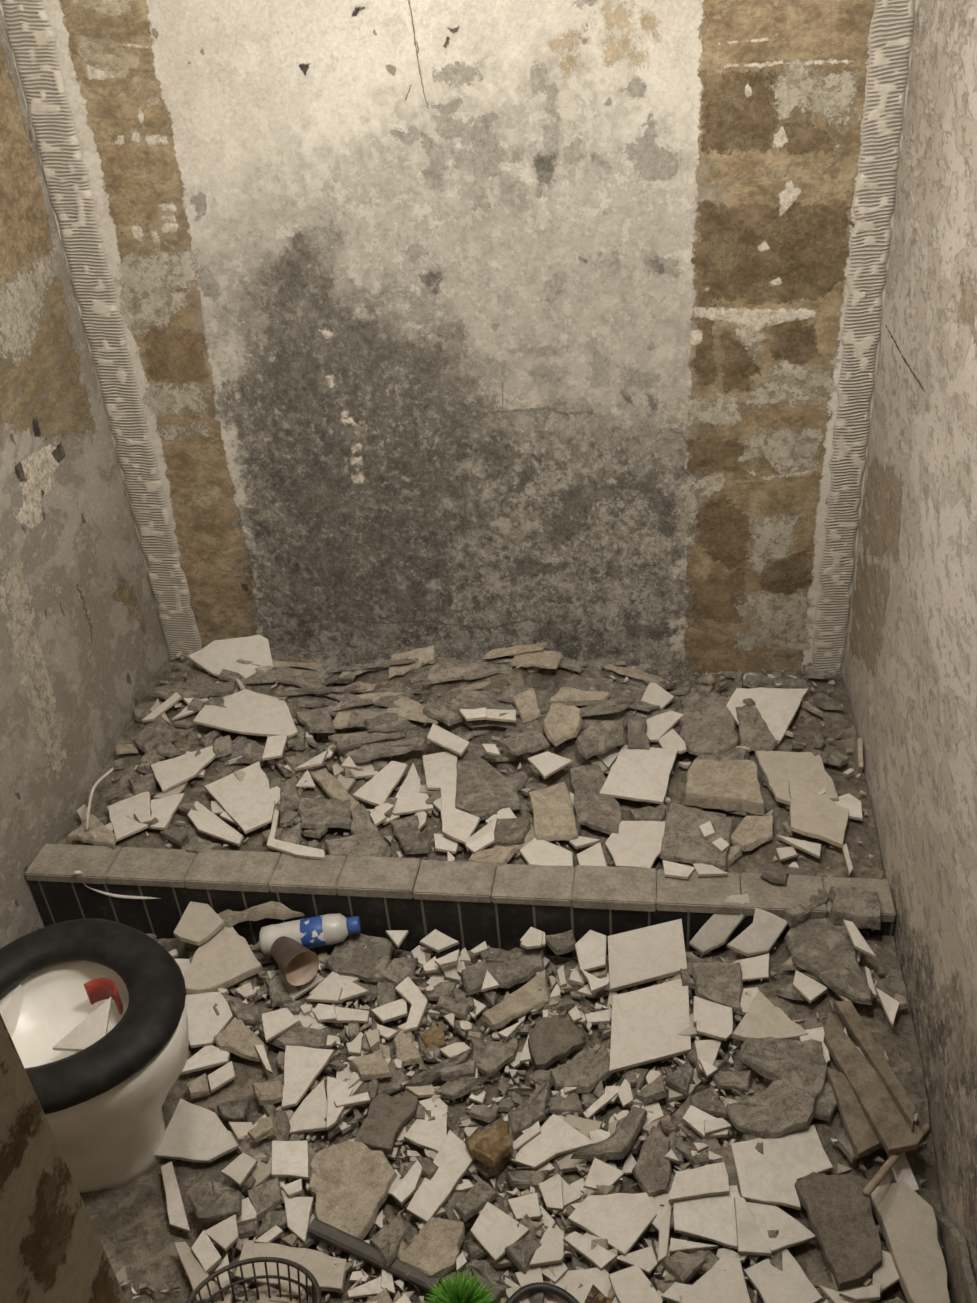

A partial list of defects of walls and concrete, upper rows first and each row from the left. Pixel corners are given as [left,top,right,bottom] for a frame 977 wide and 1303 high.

peeling [69,0,149,81]
peeling [724,57,864,150]
peeling [778,179,801,218]
peeling [0,247,56,366]
peeling [114,242,220,343]
spalling [14,416,65,529]
peeling [142,380,211,441]
water stain [213,221,711,681]
peeling [744,513,802,575]
peeling [0,553,68,784]
peeling [727,591,815,652]
peeling [18,1159,82,1303]